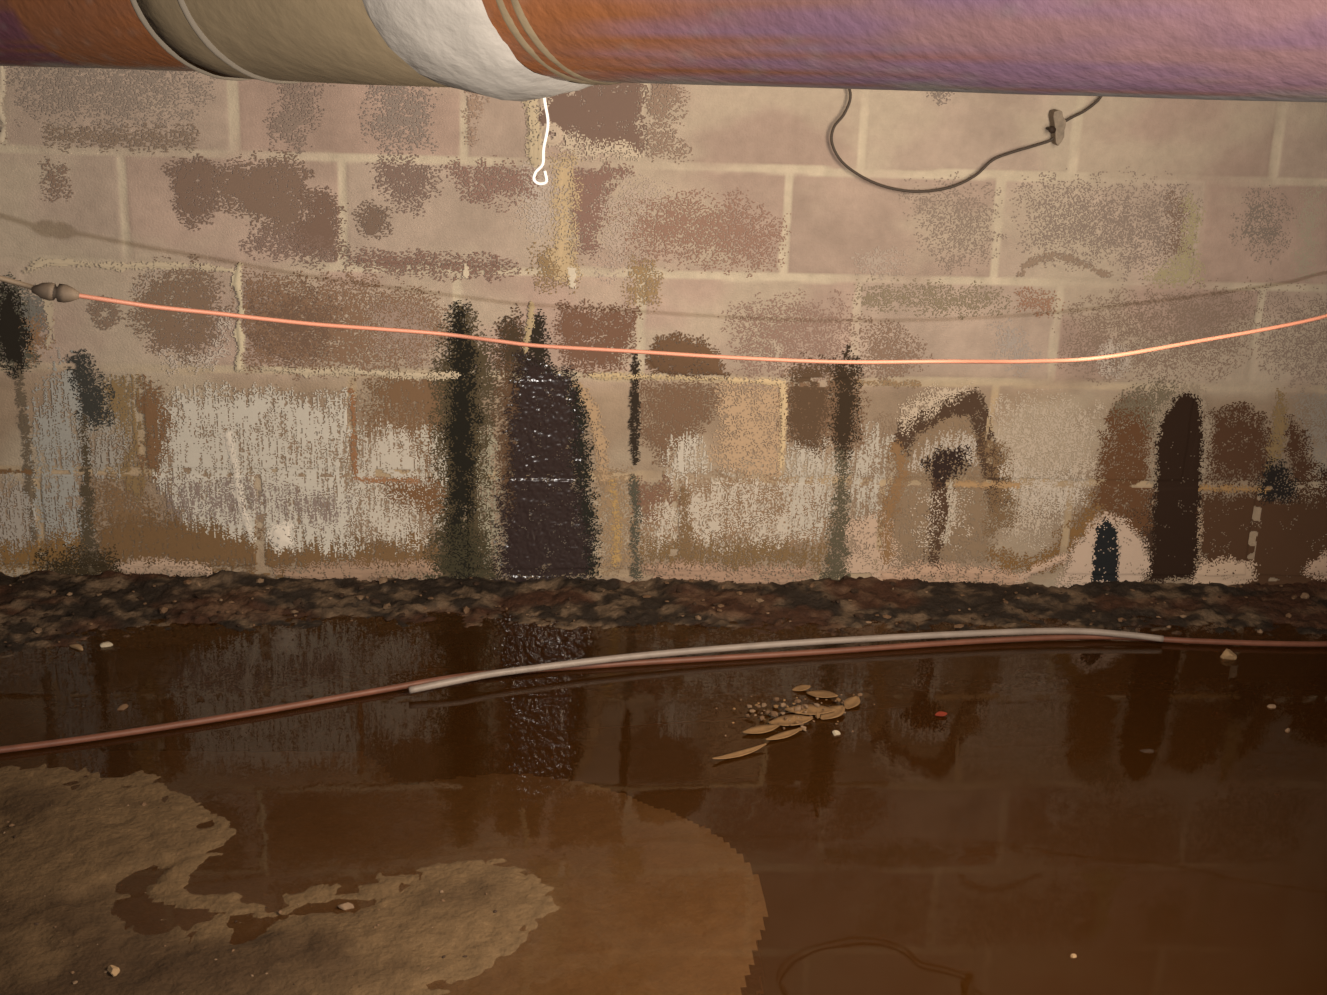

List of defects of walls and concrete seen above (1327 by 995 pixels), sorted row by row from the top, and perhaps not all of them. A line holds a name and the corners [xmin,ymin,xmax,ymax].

damp [5,66,218,142]
damp [0,82,1327,588]